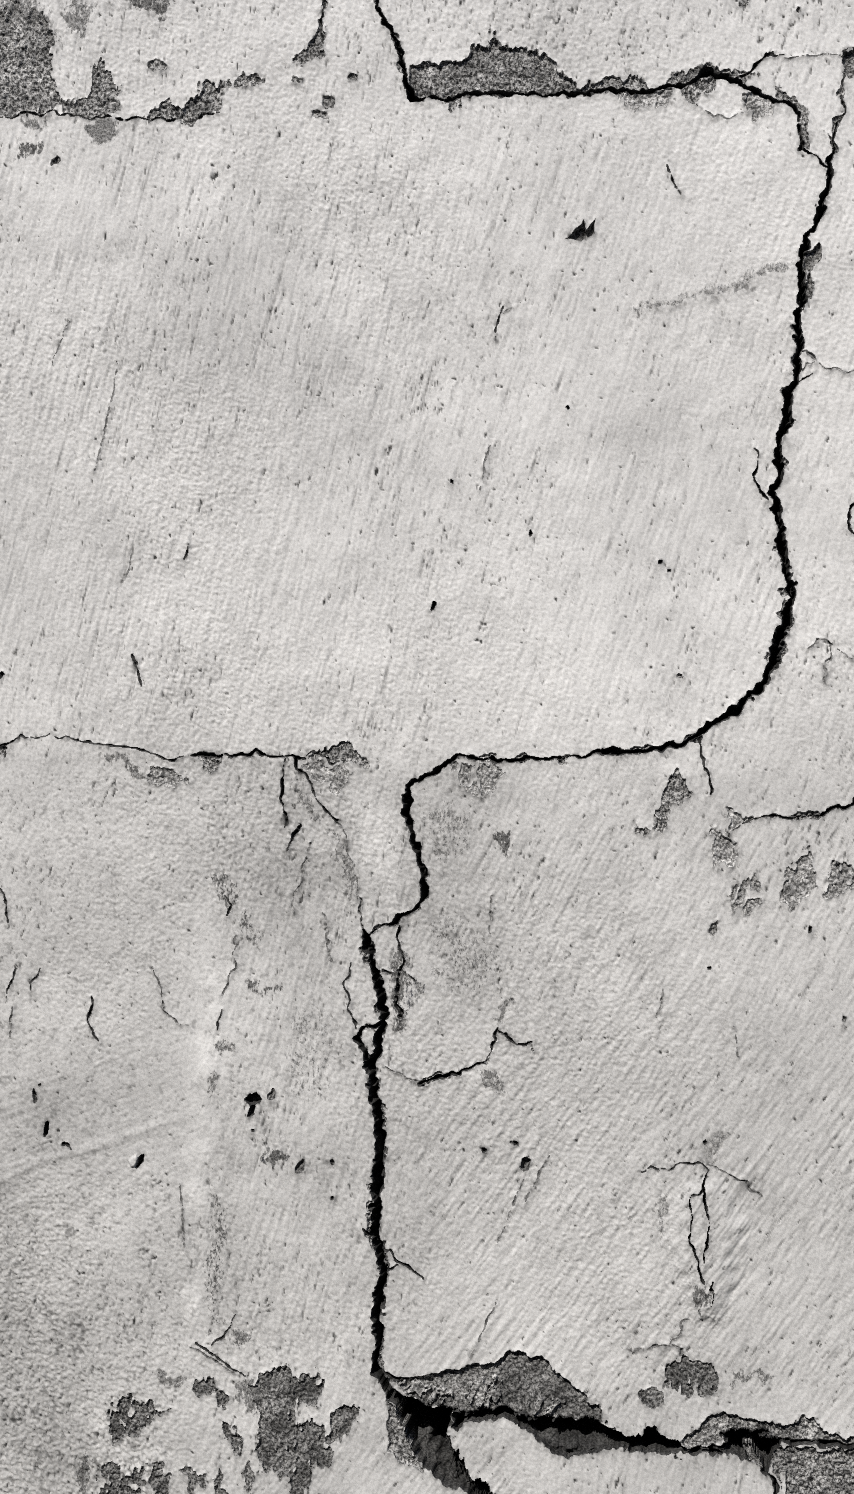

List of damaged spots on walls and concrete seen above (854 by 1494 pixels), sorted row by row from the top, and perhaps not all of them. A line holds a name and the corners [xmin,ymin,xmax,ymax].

peeling [0,0,122,120]
crack [0,109,220,123]
spalling [147,58,168,72]
peeling [143,71,266,127]
peeling [408,28,810,150]
crack [0,733,184,762]
crack [190,0,854,1430]
crack [152,966,189,1026]
peeling [95,1363,360,1494]
peeling [394,1350,608,1425]
peeling [638,1354,854,1494]
crack [685,1428,854,1494]